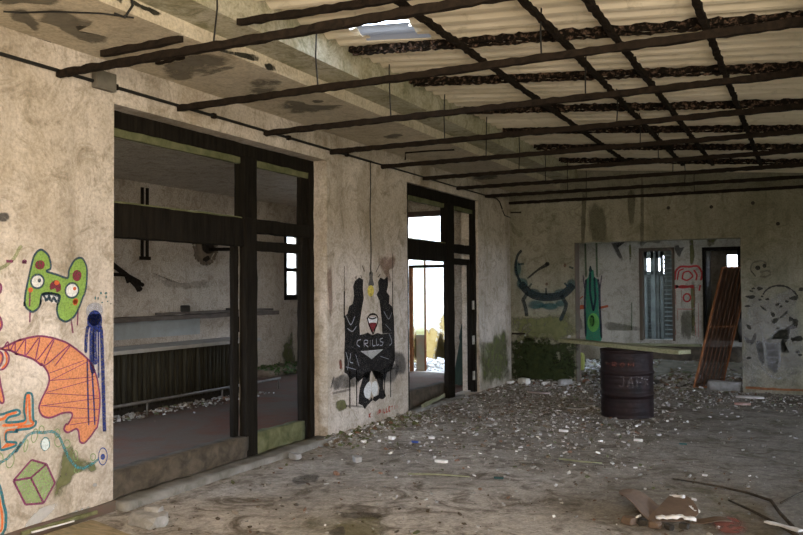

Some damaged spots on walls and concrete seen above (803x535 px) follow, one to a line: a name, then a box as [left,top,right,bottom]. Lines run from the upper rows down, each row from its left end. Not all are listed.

water stain [1,0,106,42]
water stain [133,0,160,15]
water stain [165,50,276,80]